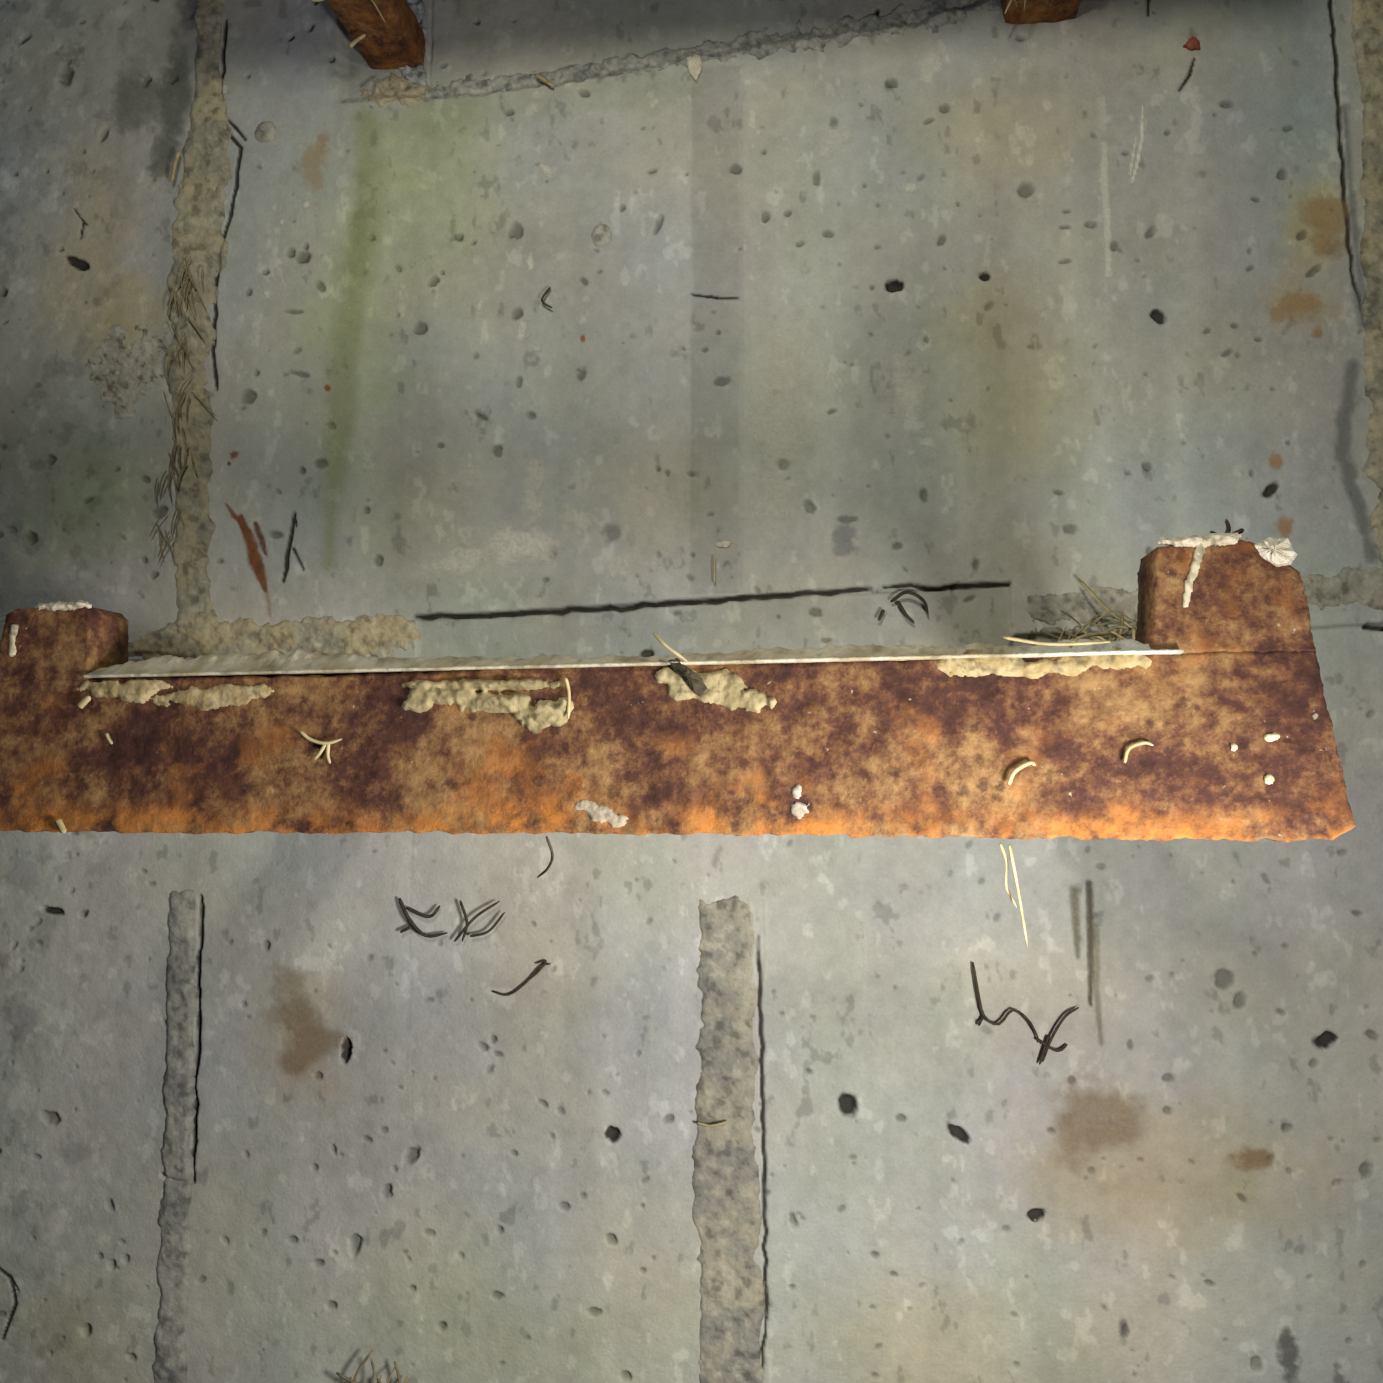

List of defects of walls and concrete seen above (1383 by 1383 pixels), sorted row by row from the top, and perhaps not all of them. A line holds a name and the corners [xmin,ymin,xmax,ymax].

crack [1328,0,1361,311]
crack [416,583,1009,620]
crack [756,935,768,1367]